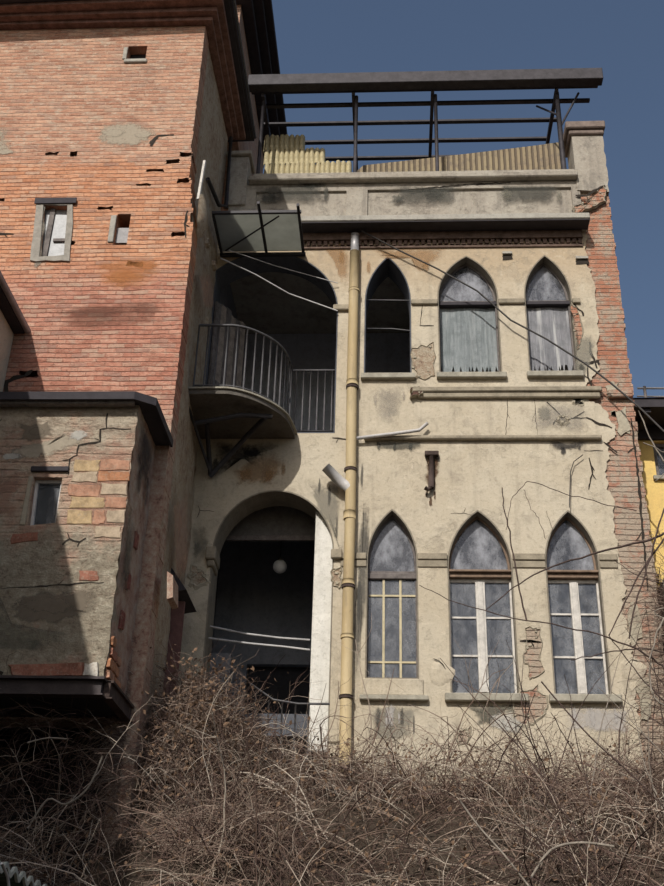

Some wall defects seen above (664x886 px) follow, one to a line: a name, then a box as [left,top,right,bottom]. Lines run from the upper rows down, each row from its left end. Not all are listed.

flaking render [572,185,607,213]
flaking render [570,304,584,350]
flaking render [409,342,436,400]
crack [65,413,131,474]
flaking render [556,414,571,427]
flaking render [611,406,631,436]
flaking render [67,459,131,539]
crack [533,401,648,590]
crack [2,580,104,589]
flaking render [511,626,549,728]